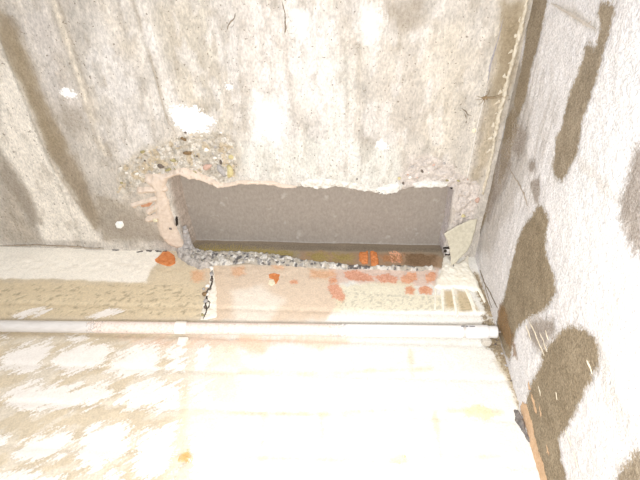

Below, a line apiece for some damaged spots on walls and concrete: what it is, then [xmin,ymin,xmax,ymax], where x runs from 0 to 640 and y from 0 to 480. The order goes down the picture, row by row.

damp [551,0,618,185]
flaking render [155,251,176,266]
spalling [116,128,239,194]
crack [200,266,217,320]
spalling [296,156,480,265]
corrosion [378,251,439,268]
damp [480,0,602,480]
damp [616,135,640,267]